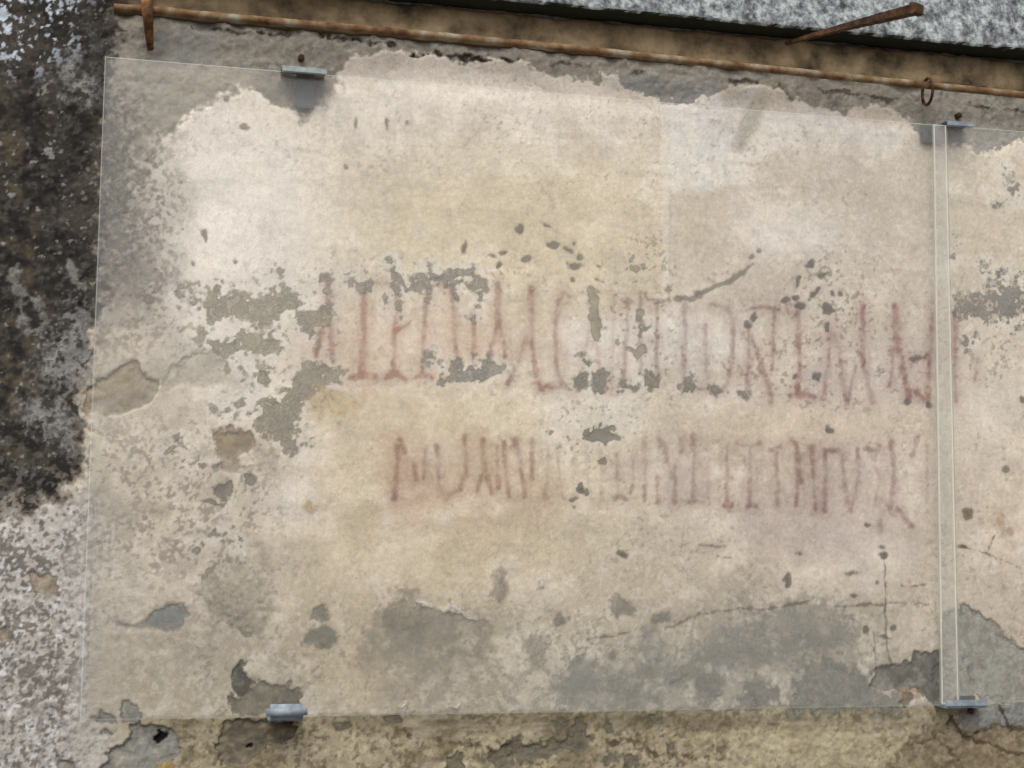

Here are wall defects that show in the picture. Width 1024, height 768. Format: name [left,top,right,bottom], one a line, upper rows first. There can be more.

leakage [0,0,148,521]
peeling [953,260,1024,353]
spalling [84,360,159,415]
peeling [165,256,489,467]
peeling [424,351,506,386]
spalling [146,604,189,631]
crack [665,600,810,629]
crack [836,582,891,662]
spalling [92,700,181,768]
spalling [215,660,303,768]
spalling [485,714,612,768]
peeling [869,603,1024,768]